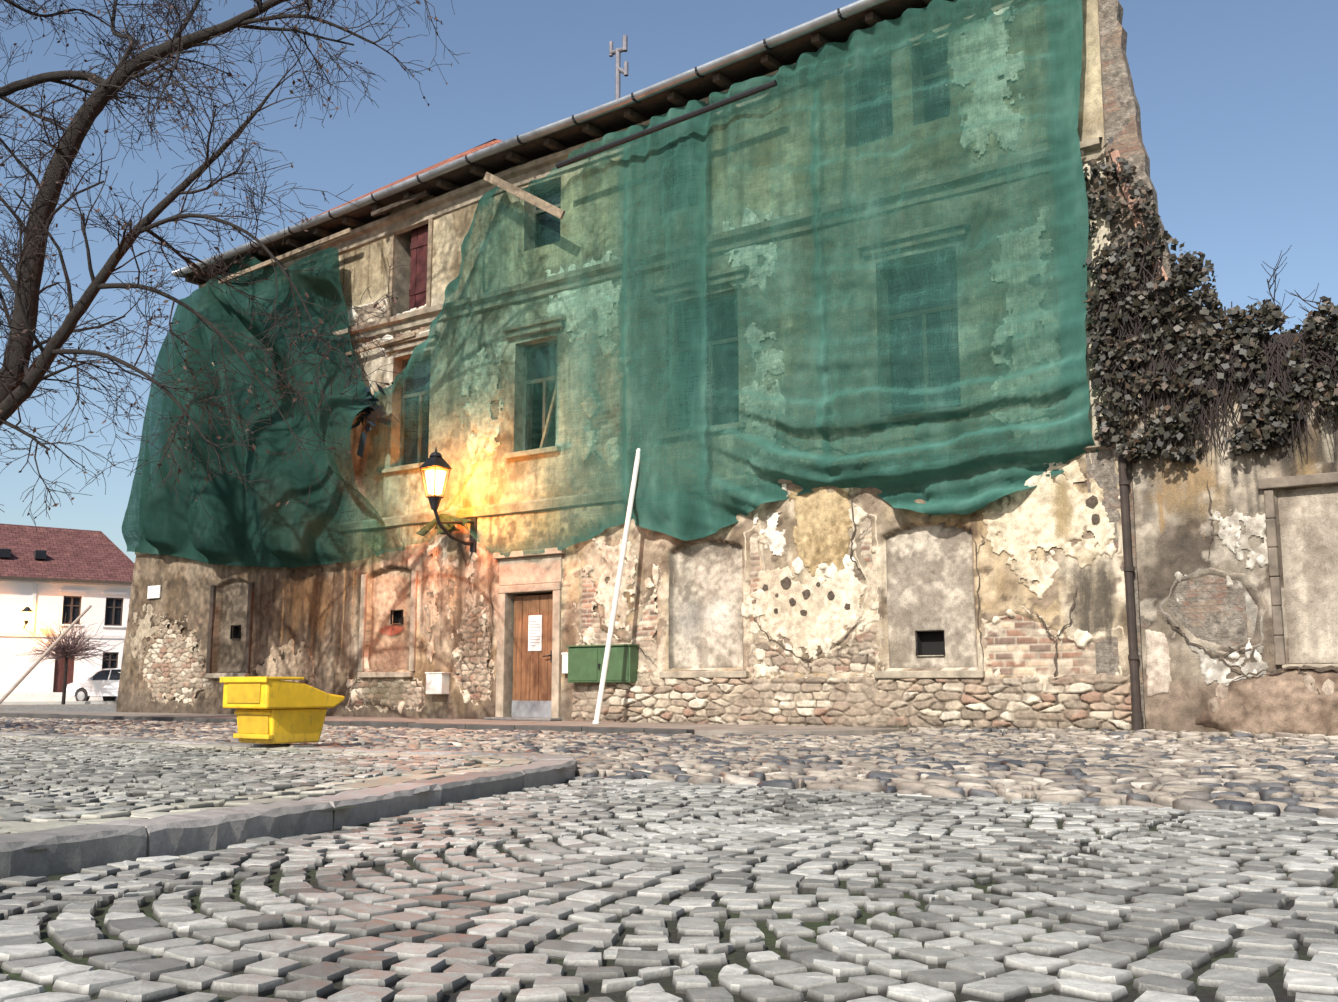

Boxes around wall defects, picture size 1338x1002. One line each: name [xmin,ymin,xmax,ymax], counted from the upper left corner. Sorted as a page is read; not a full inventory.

flaking render [740,332,784,426]
spalling [129,604,218,709]
flaking render [255,639,315,686]
spalling [572,538,663,680]
flaking render [741,484,884,680]
flaking render [976,451,1128,694]
flaking render [1145,509,1269,697]